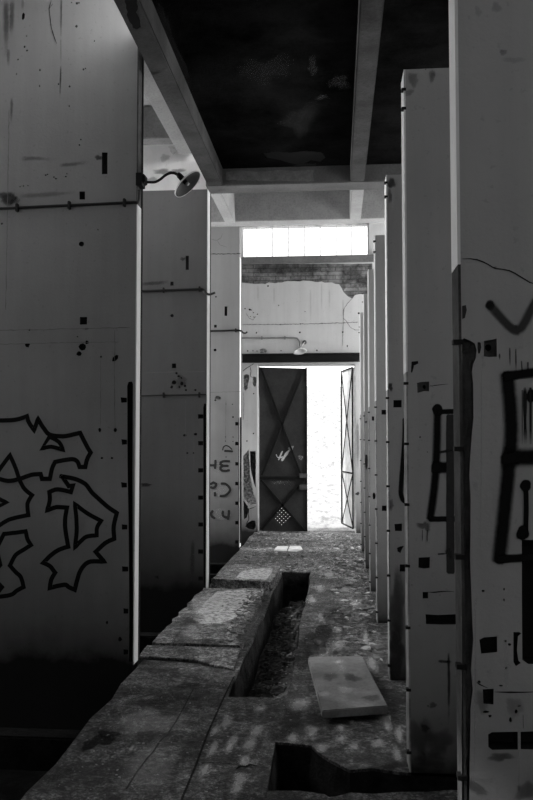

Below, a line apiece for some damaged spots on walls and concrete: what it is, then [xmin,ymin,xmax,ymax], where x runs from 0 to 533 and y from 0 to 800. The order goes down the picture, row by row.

flaking render [242,264,372,303]
crack [465,258,533,284]